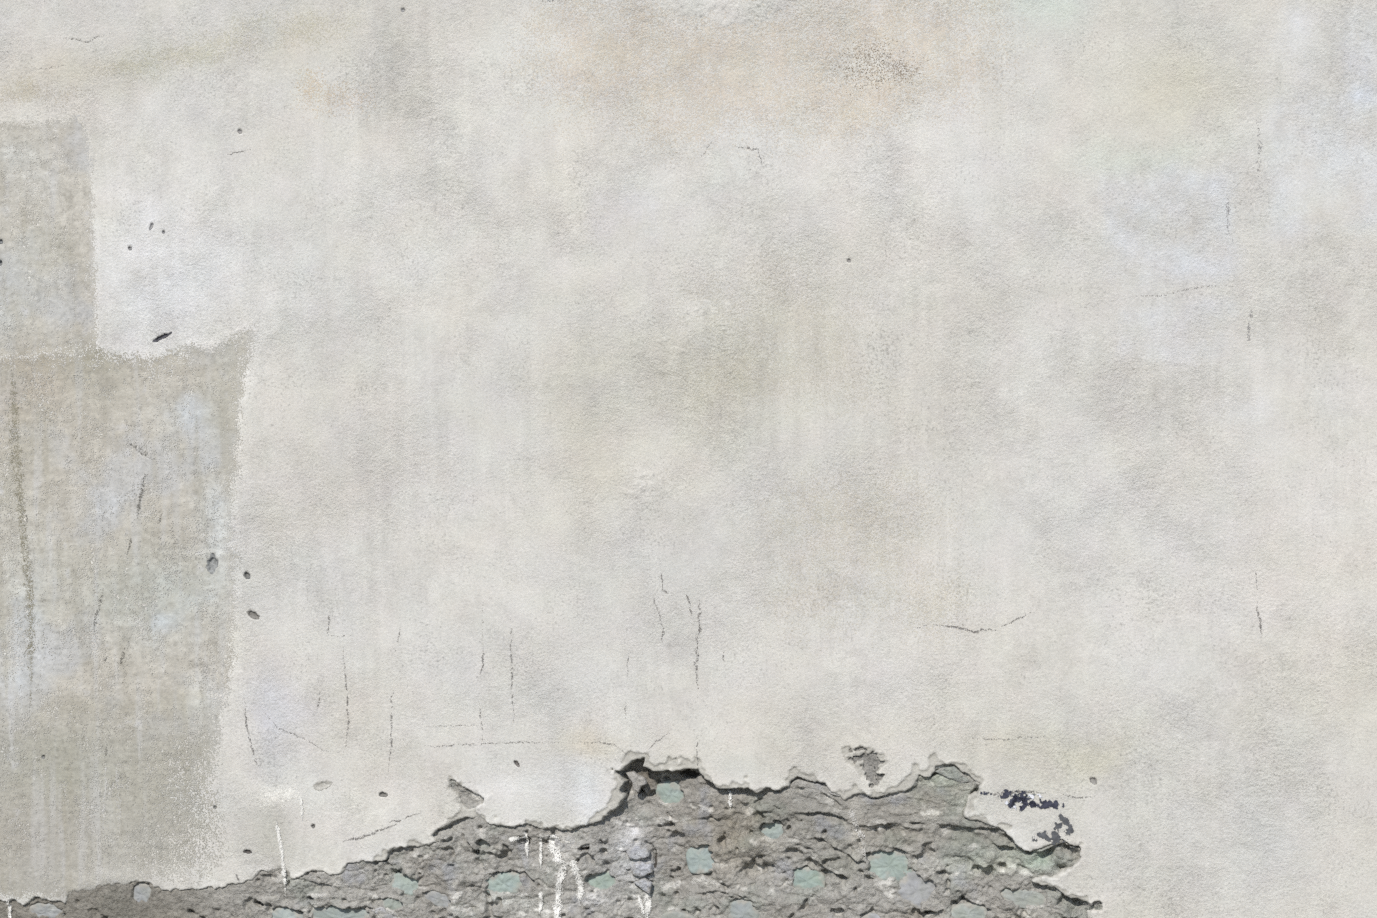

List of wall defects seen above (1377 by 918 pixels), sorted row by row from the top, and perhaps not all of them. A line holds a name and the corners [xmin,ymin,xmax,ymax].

damp [6,361,36,717]
peeling [0,114,1102,918]